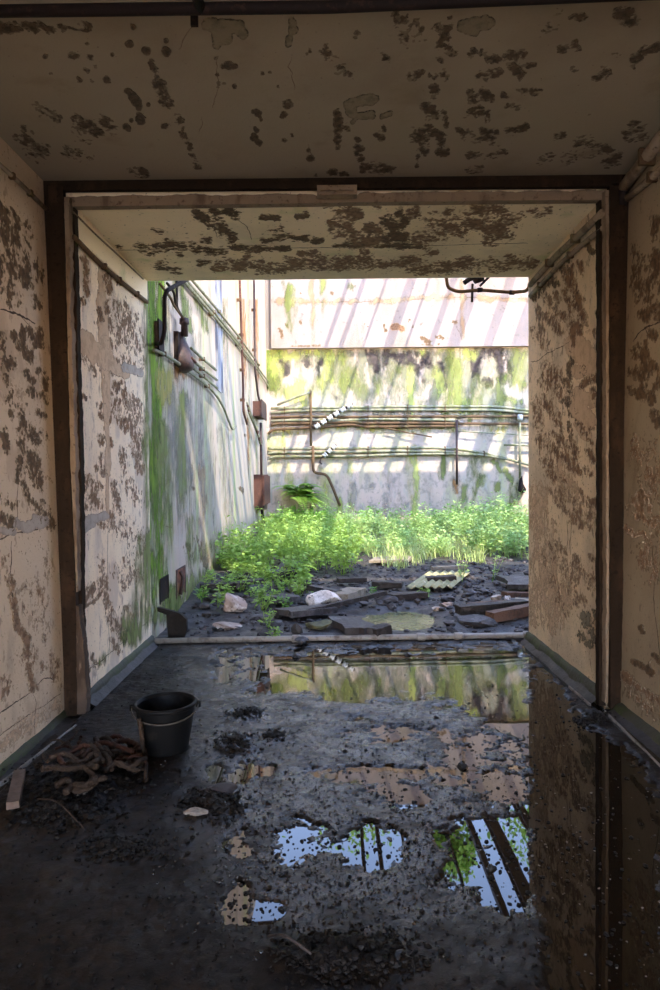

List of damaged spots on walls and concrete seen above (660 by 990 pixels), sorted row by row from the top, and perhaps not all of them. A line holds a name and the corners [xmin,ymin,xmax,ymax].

peeling [391,11,543,174]
peeling [0,200,45,311]
peeling [115,204,553,276]
peeling [0,323,55,536]
peeling [79,254,147,657]
water stain [120,281,231,648]
water stain [266,350,290,391]
water stain [303,355,330,379]
water stain [408,449,419,517]
water stain [365,347,528,432]
water stain [457,456,519,510]
peeling [528,242,597,649]